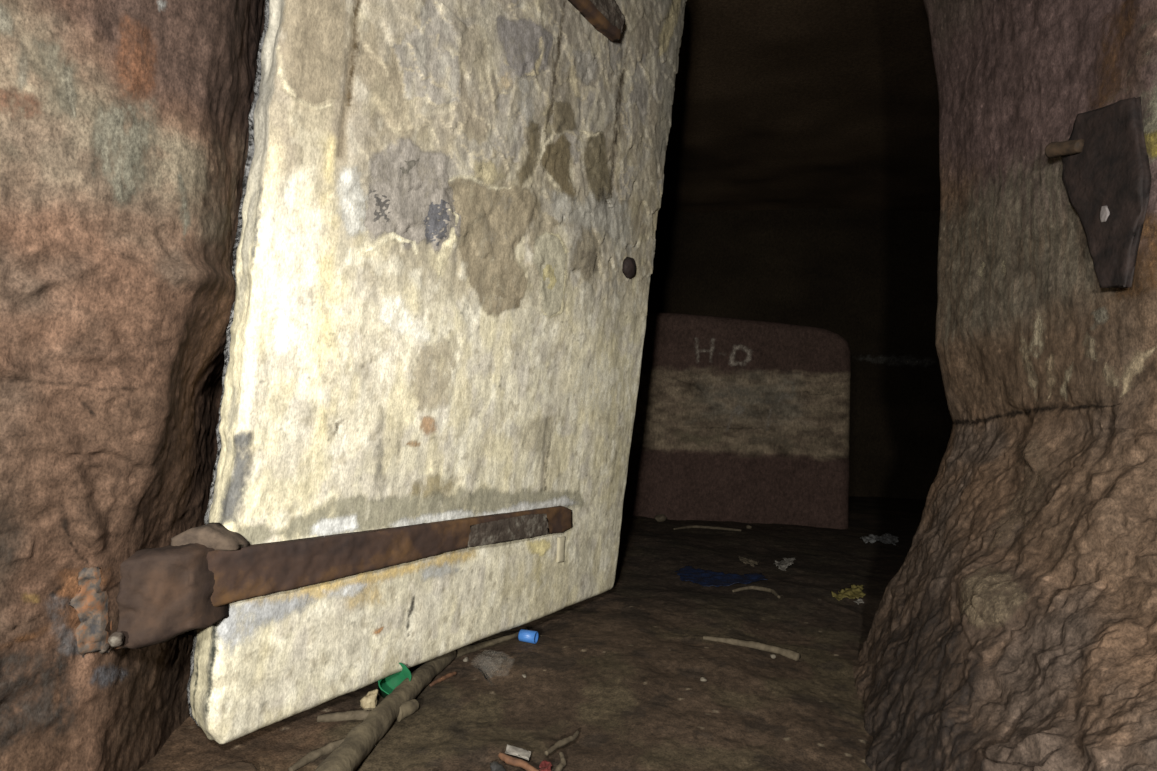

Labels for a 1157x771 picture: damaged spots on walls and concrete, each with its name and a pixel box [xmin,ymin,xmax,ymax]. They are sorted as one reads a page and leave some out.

crack [955,404,1119,425]
corrosion [247,551,474,606]